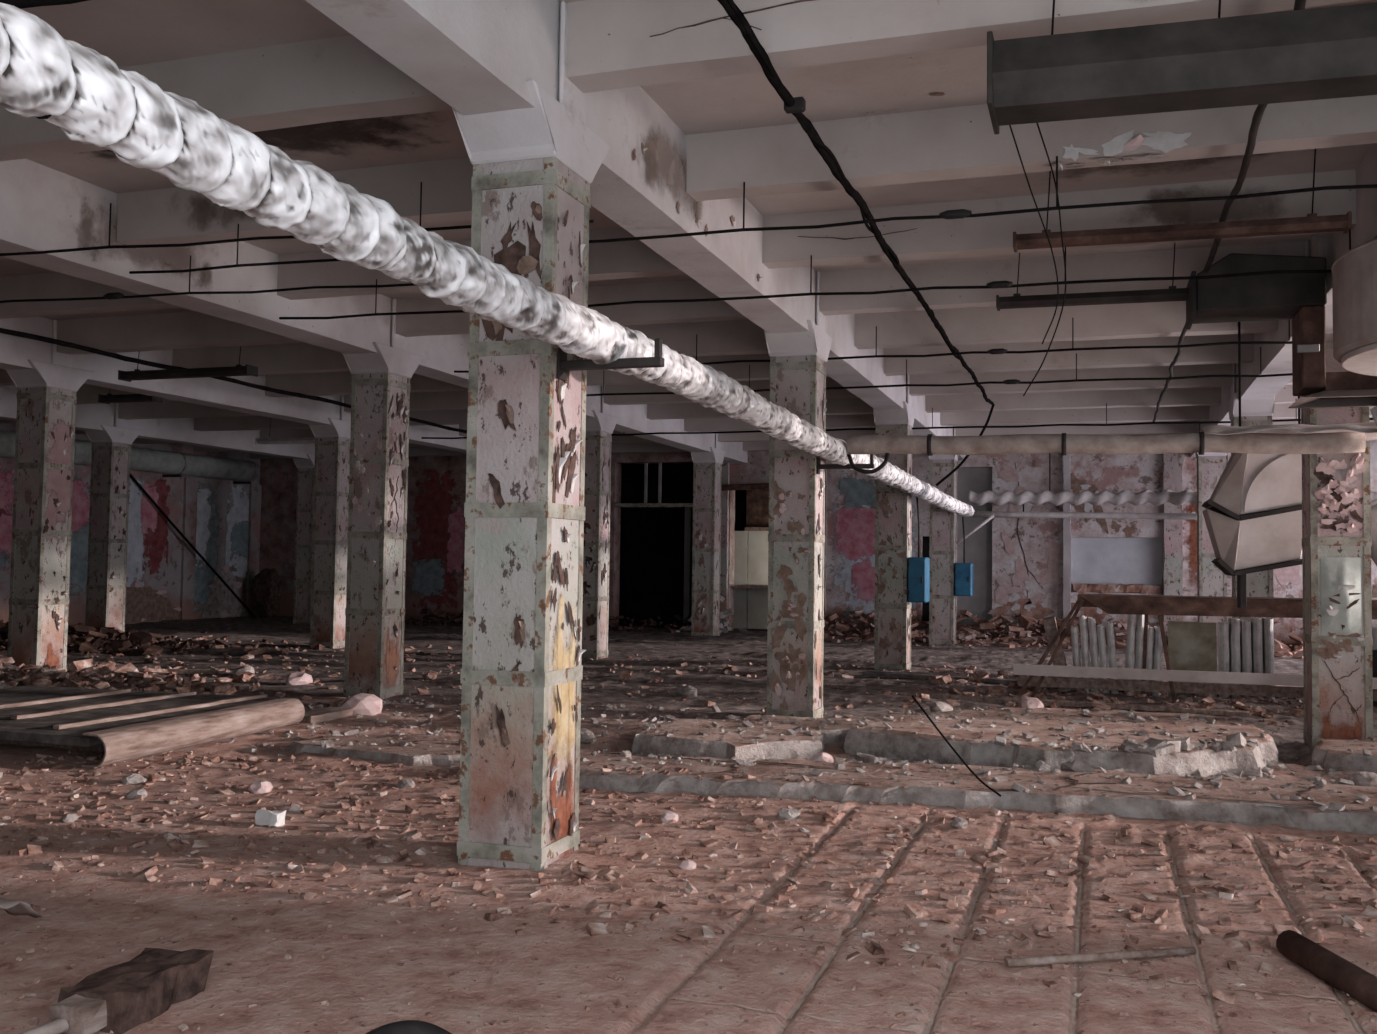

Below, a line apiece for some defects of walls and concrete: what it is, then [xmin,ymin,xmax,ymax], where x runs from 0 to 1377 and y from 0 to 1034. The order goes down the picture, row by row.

peeling [494,201,543,279]
peeling [481,318,513,341]
peeling [498,399,516,431]
peeling [339,392,409,531]
peeling [489,473,505,509]
peeling [551,371,610,666]
flaking render [1314,452,1367,534]
flaking render [109,572,181,623]
peeling [769,479,921,710]
corrosion [45,644,60,669]
peeling [511,614,525,684]
peeling [550,685,578,736]